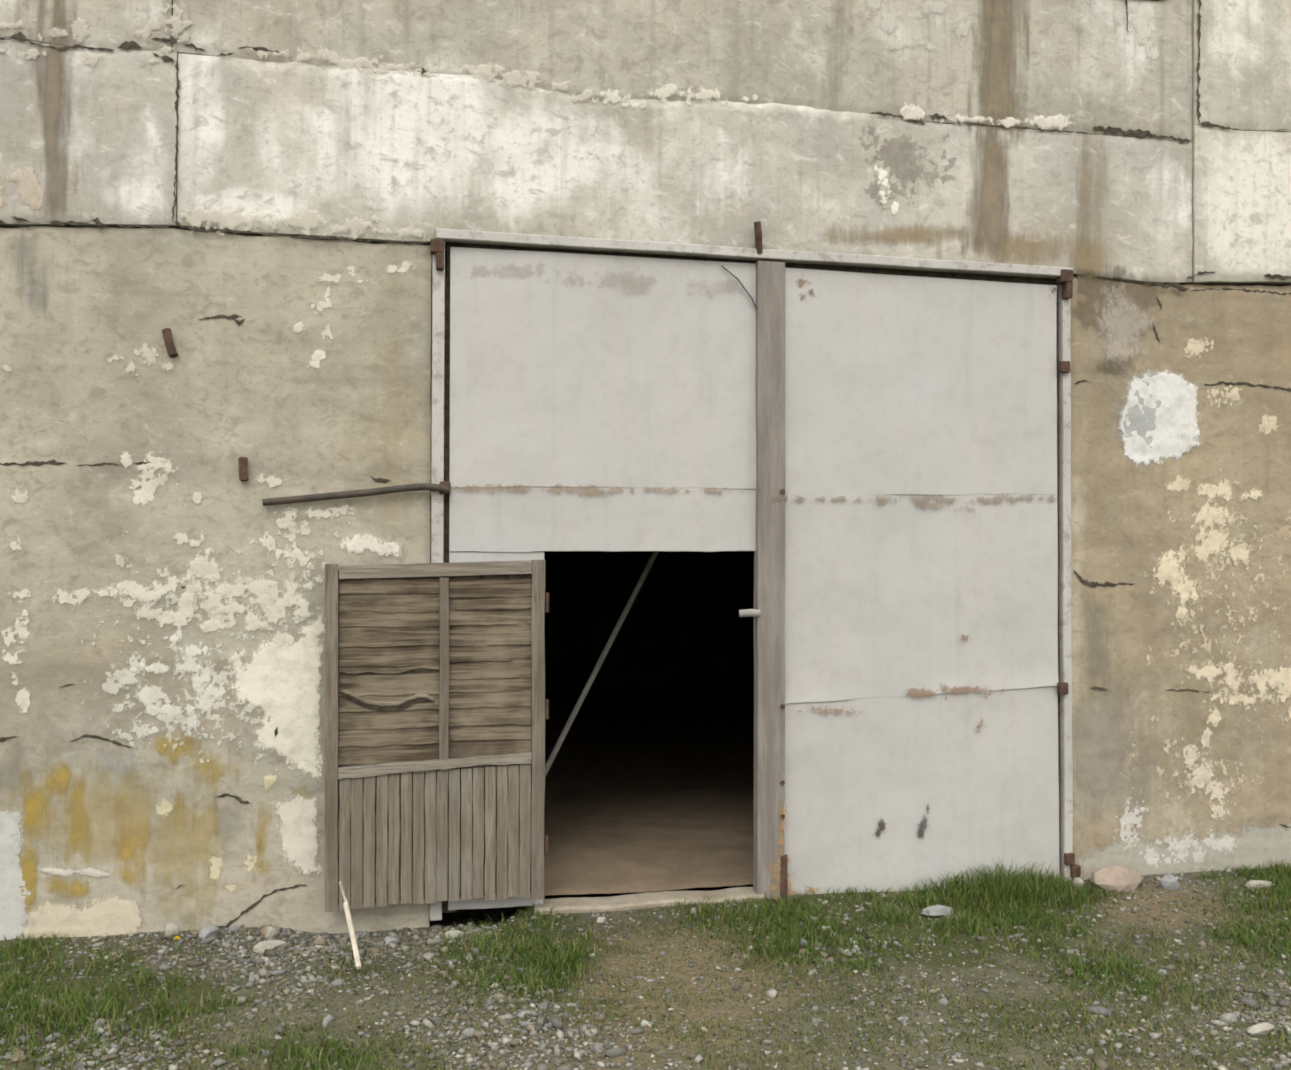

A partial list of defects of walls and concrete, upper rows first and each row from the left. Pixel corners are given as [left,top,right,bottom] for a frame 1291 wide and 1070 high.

damp [38,0,71,215]
crack [0,31,280,222]
damp [975,0,1039,261]
crack [0,459,149,467]
rust [911,495,955,509]
rust [981,495,1055,504]
flaking render [1119,370,1242,466]
peeling [1,504,407,876]
rust [906,686,1003,700]
peeling [1091,469,1291,891]
damp [19,766,88,905]
crack [218,884,307,929]